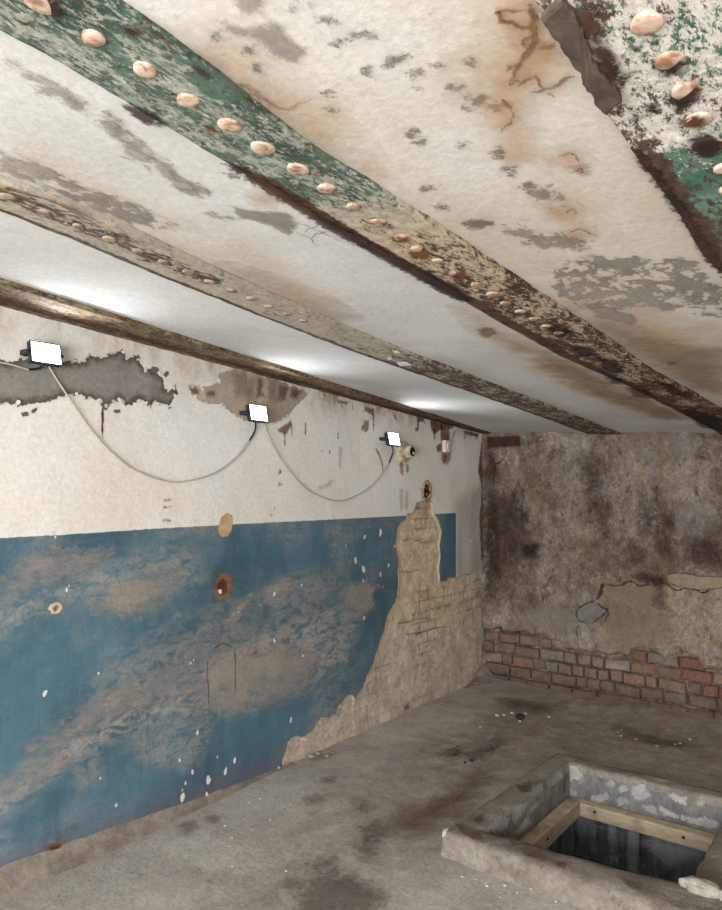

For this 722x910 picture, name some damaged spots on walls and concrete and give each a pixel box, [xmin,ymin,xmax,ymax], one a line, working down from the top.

water stain [330,31,378,48]
water stain [384,53,413,68]
water stain [445,83,505,112]
water stain [405,129,427,145]
peeling [504,220,722,324]
peeling [0,349,178,439]
peeling [189,370,307,426]
water stain [547,345,722,431]
spalling [48,602,63,614]
rust [215,573,232,597]
spalling [278,485,722,769]
crack [565,581,710,648]